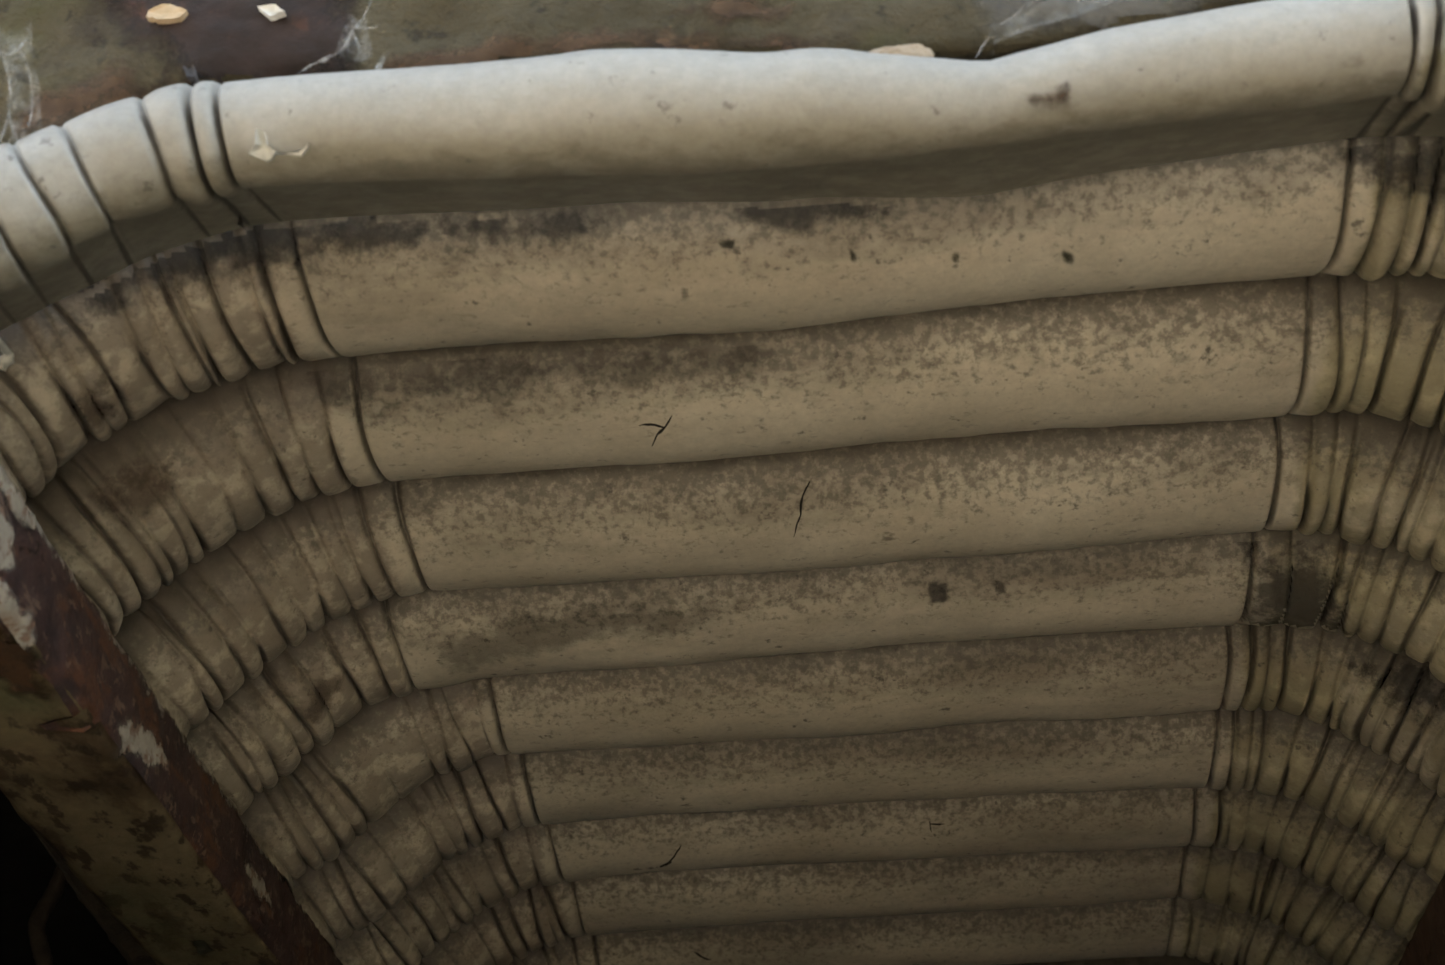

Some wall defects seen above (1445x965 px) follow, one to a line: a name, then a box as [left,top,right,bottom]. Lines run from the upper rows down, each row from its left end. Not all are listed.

leakage [743,203,889,230]
leakage [1349,144,1445,212]
leakage [1242,543,1349,634]
rust [0,488,343,965]
leakage [1350,664,1445,725]
rust [1399,875,1445,965]